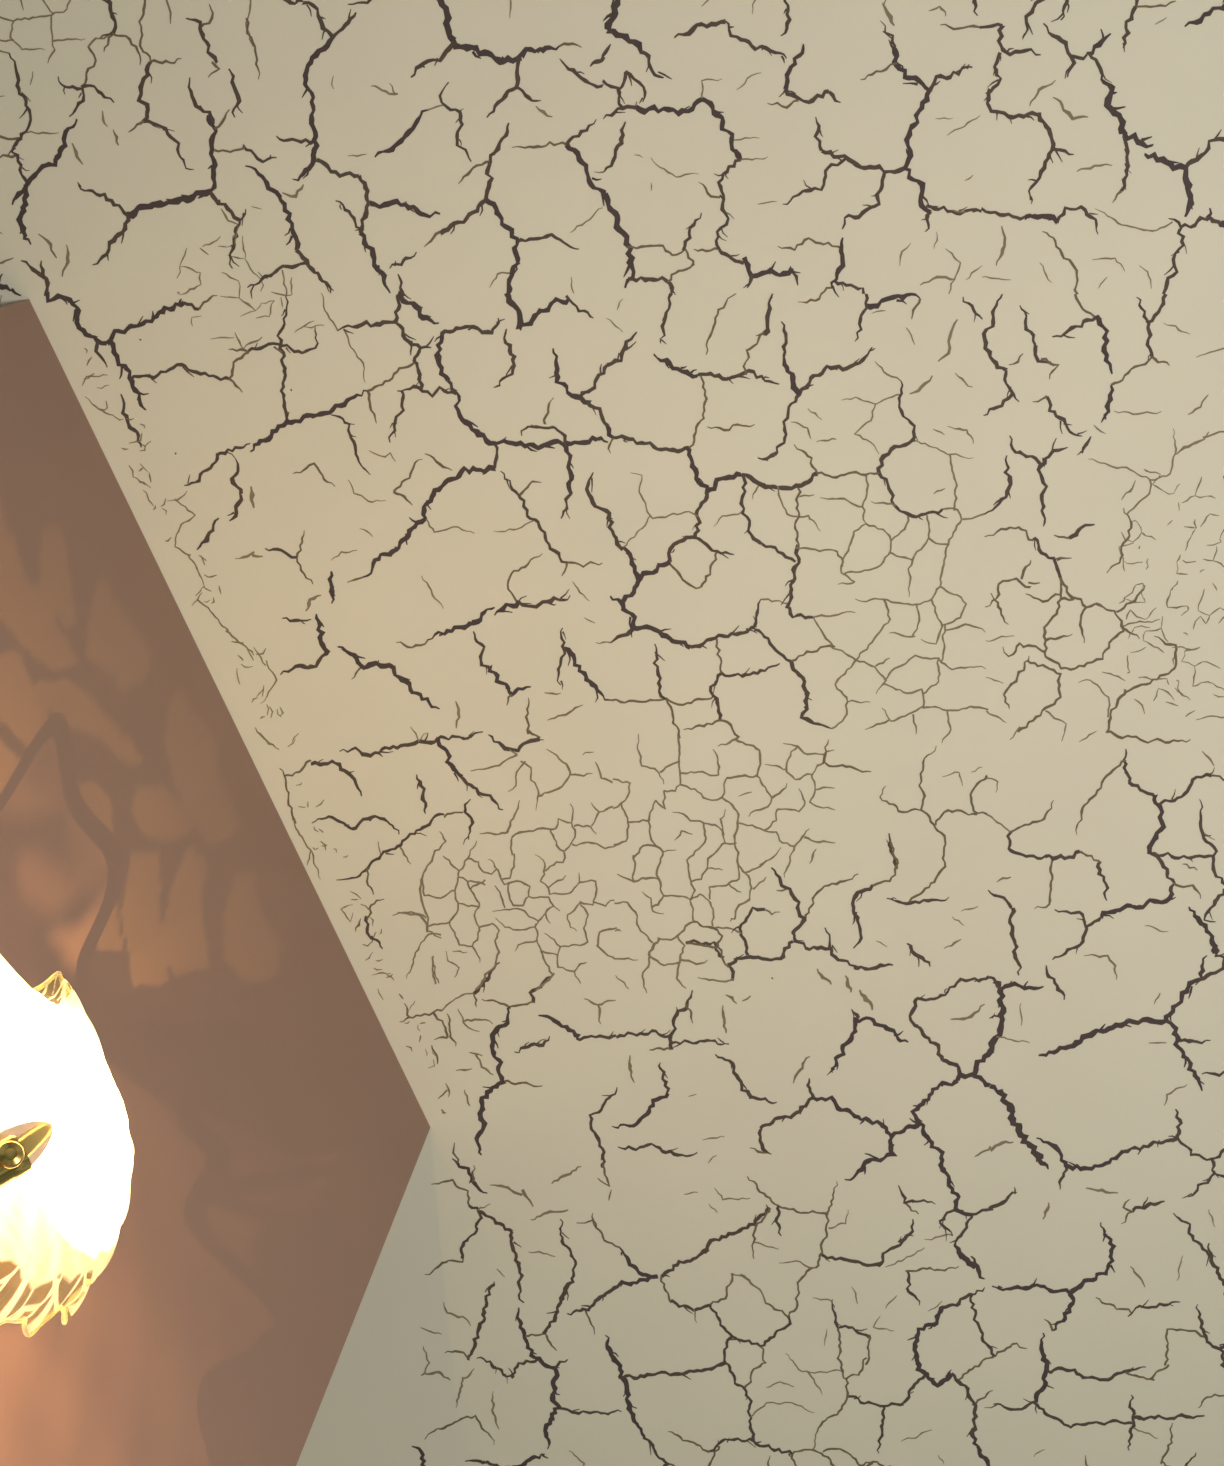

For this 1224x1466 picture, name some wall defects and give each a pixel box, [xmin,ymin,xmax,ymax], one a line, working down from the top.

crack [0,0,1224,1155]